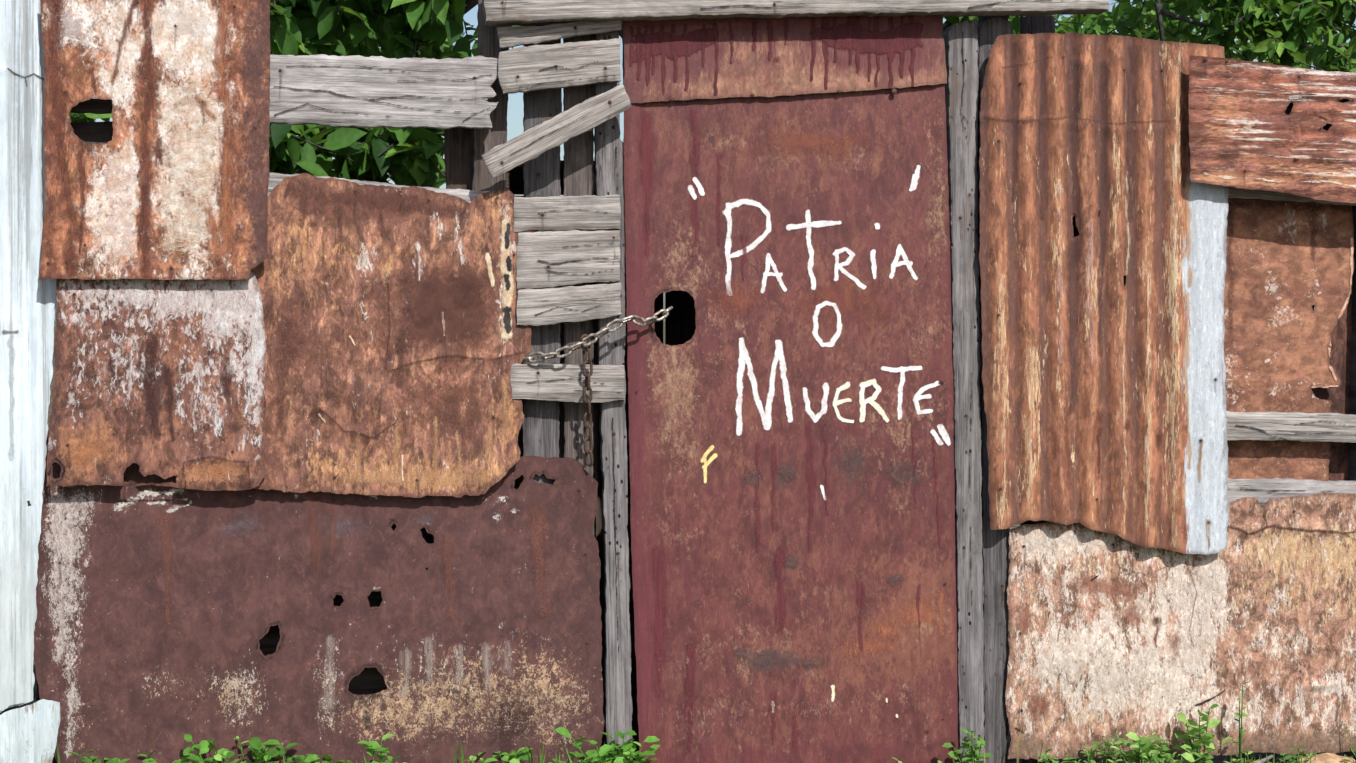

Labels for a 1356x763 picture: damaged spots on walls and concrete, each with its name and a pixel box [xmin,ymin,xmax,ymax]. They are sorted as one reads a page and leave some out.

corrosion [48,0,85,274]
corrosion [90,0,164,277]
corrosion [144,334,175,440]
corrosion [195,0,234,255]
corrosion [221,363,233,394]
corrosion [397,274,486,388]
corrosion [1067,60,1083,414]
corrosion [1098,62,1110,356]
corrosion [1184,182,1202,482]
corrosion [1228,200,1350,324]
corrosion [207,662,266,727]
corrosion [314,654,372,740]